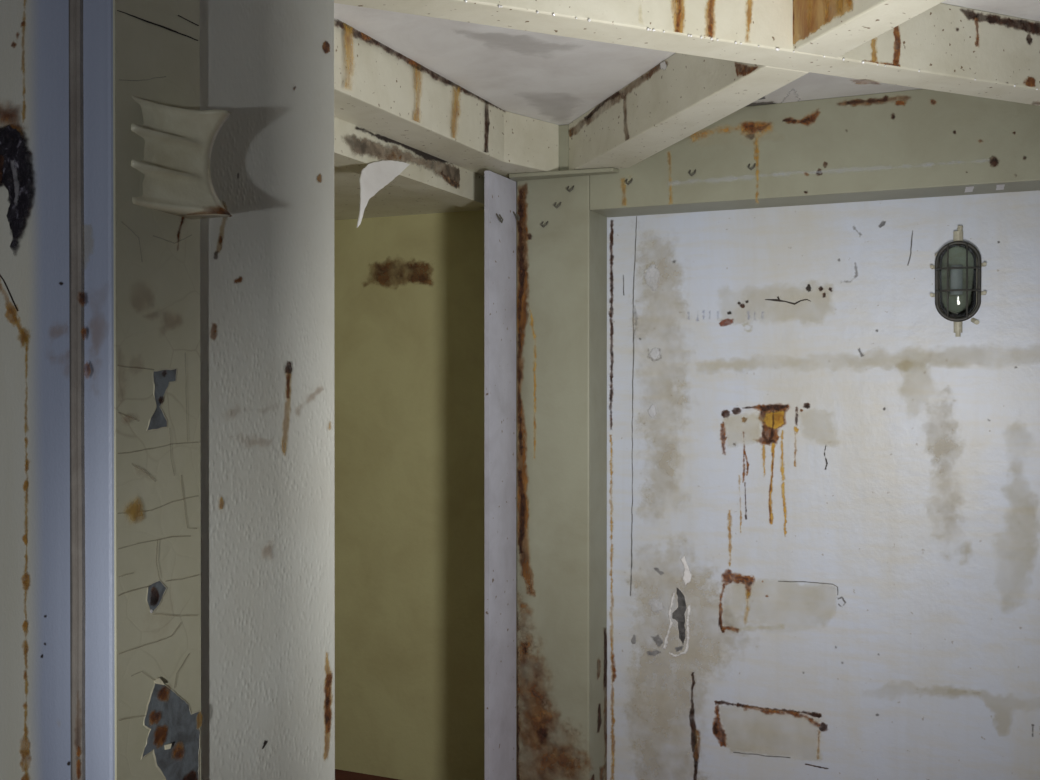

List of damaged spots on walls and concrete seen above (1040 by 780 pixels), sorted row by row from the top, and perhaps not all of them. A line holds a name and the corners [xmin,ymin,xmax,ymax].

rust [793,0,853,44]
rust [0,276,29,346]
peeling [146,368,177,431]
rust [517,184,616,780]
rust [719,403,810,632]
spalling [647,555,692,657]
rust [20,729,30,780]
peeling [141,677,203,780]
rust [713,701,827,758]